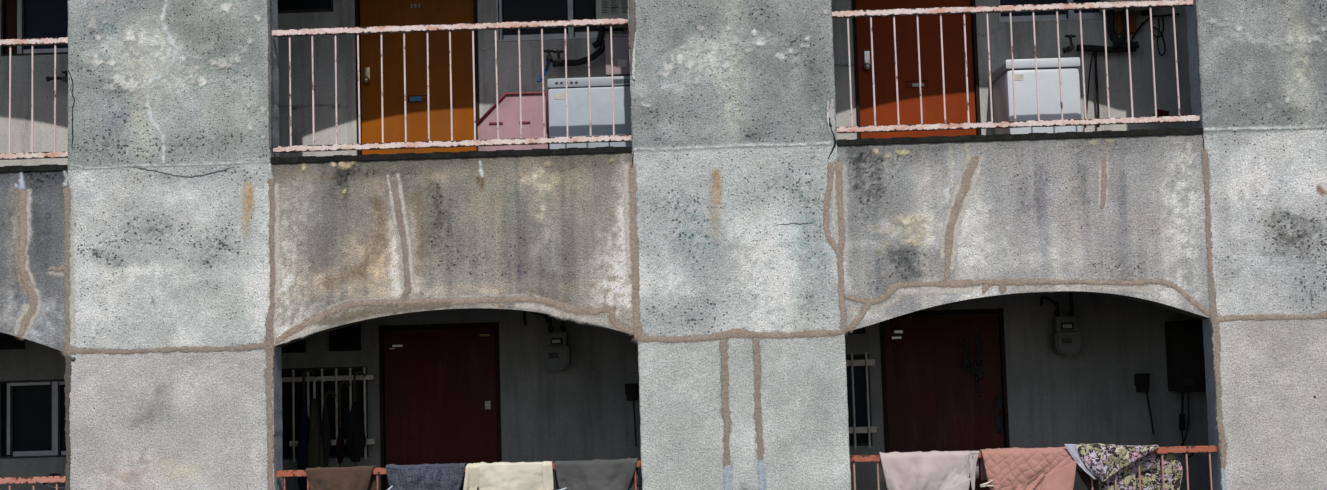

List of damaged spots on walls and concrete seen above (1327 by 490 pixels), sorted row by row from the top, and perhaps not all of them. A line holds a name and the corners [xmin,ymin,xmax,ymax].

crack [67,69,75,150]
corrosion [244,183,253,224]
crack [14,118,1327,490]